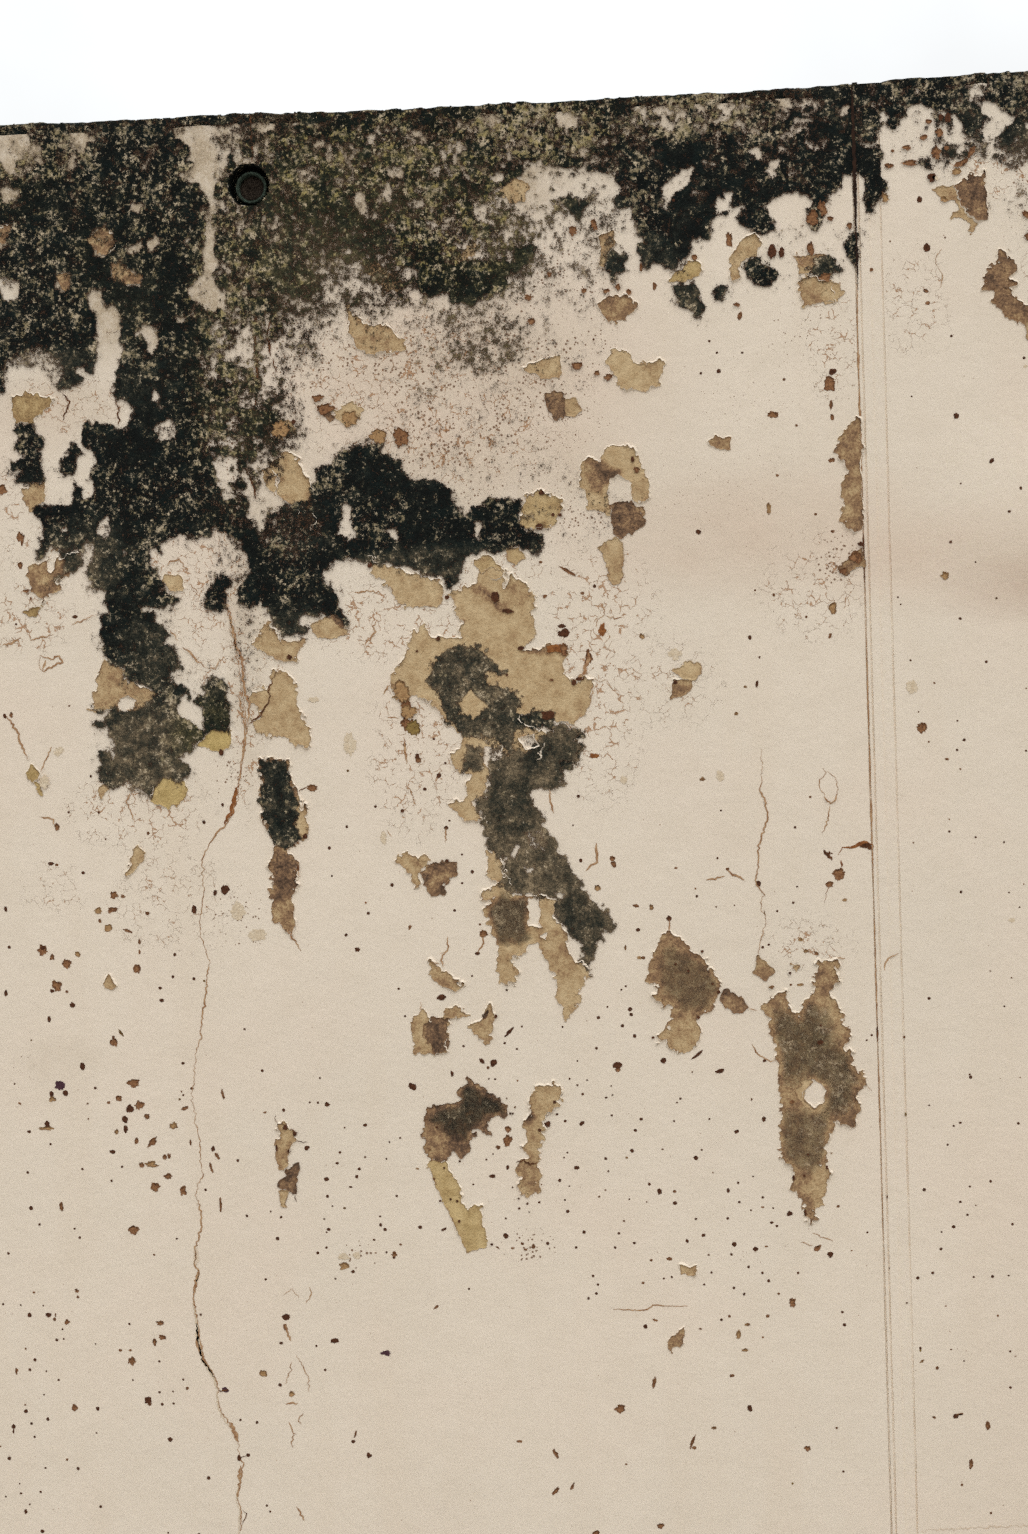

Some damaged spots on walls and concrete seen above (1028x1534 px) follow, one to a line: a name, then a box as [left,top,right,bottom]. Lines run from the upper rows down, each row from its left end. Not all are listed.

damp [0,119,1028,801]
peeling [521,347,667,421]
peeling [581,283,640,326]
peeling [824,369,866,576]
peeling [980,247,1028,340]
peeling [221,614,348,941]
peeling [366,443,651,1022]
crack [166,543,251,1534]
peeling [274,1120,310,1208]
peeling [410,957,514,1067]
peeling [420,1076,564,1253]
peeling [644,929,868,1226]